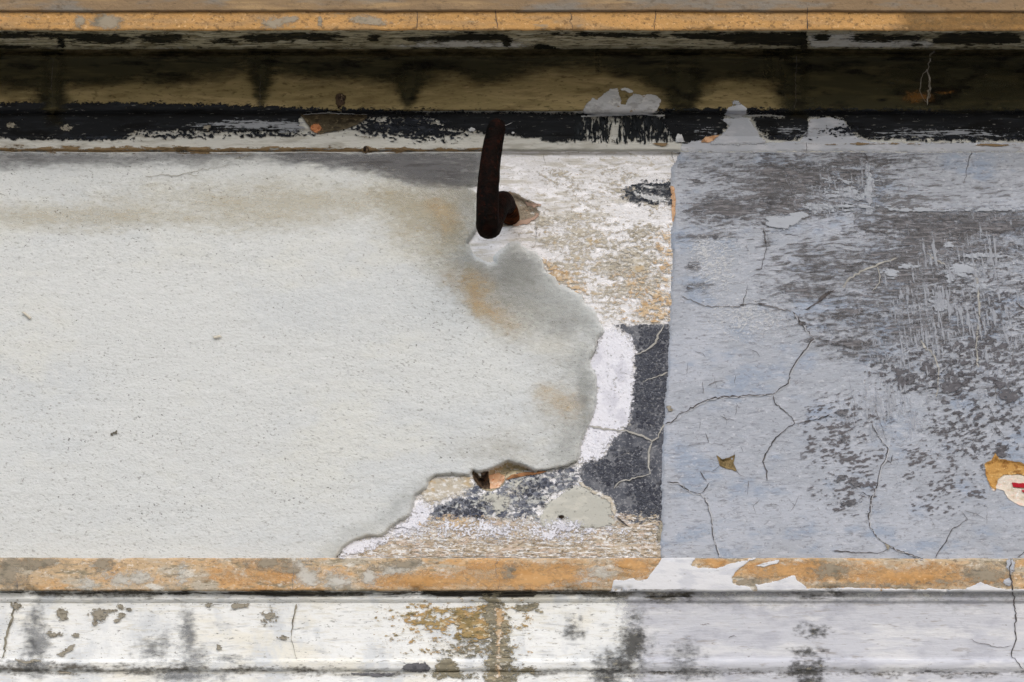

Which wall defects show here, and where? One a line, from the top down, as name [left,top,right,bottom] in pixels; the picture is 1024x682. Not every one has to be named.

damp [906,57,1024,108]
crack [864,154,895,232]
peeling [0,99,1024,516]
crack [974,274,984,367]
crack [591,229,896,557]
crack [920,340,939,396]
flaking render [293,445,663,588]
crack [834,399,988,560]
peeling [46,608,79,657]
peeling [87,604,132,626]
peeling [260,605,289,640]
peeling [373,592,543,682]